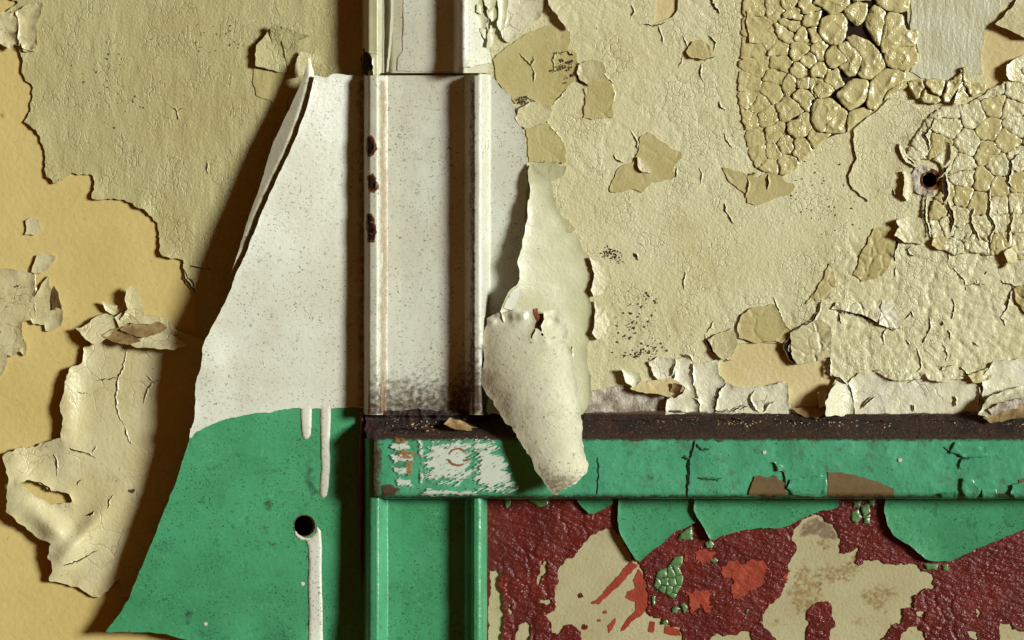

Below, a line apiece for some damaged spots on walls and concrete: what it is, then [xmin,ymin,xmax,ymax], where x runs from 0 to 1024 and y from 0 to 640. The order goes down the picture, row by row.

peeling [397,0,1024,507]
crack [773,118,1019,408]
peeling [0,0,394,640]
crack [77,348,162,445]
crack [38,445,97,490]
crack [683,440,722,497]
crack [944,447,981,469]
crack [85,495,114,517]
crack [64,550,98,566]
peeling [537,462,1024,640]
peeling [488,570,531,640]